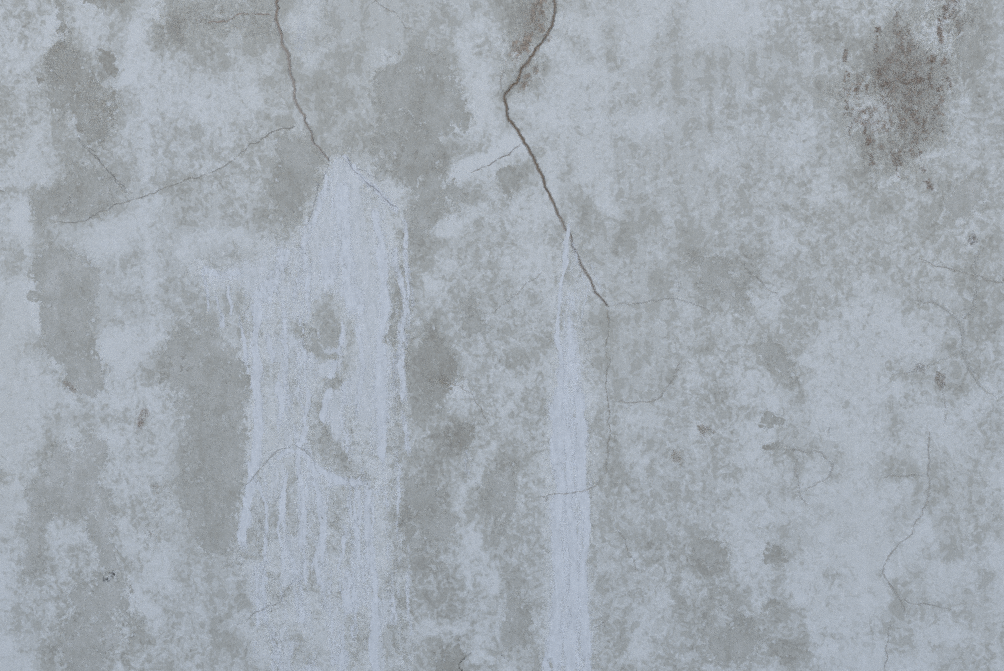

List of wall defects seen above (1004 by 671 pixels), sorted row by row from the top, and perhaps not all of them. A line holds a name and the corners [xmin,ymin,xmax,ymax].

crack [54,0,395,226]
leakage [201,154,415,671]
leakage [541,221,603,671]
crack [473,0,707,501]
rust [842,0,968,179]